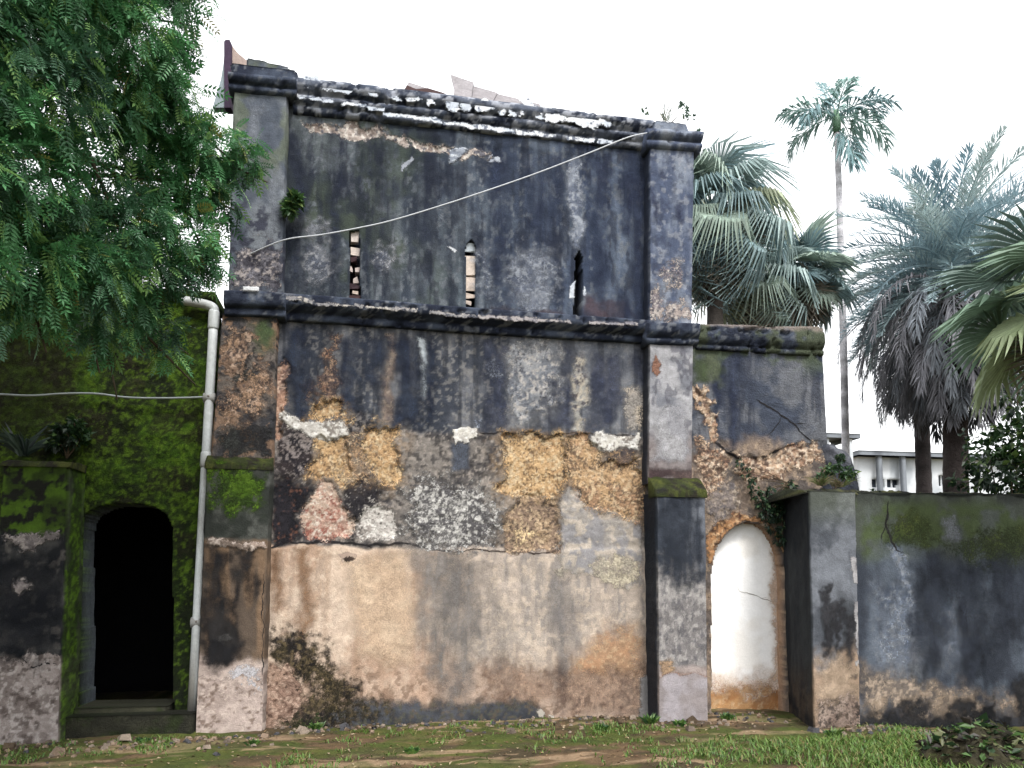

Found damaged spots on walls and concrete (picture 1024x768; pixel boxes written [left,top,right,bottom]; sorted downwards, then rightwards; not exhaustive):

spalling [297,75,613,172]
water stain [289,133,399,292]
water stain [413,151,434,272]
water stain [473,151,658,319]
flaking render [650,259,692,323]
spalling [2,530,60,553]
water stain [200,325,644,728]
spalling [207,326,645,590]
spalling [655,384,825,564]
crack [715,400,814,460]
crack [881,504,904,553]
water stain [815,547,1024,729]